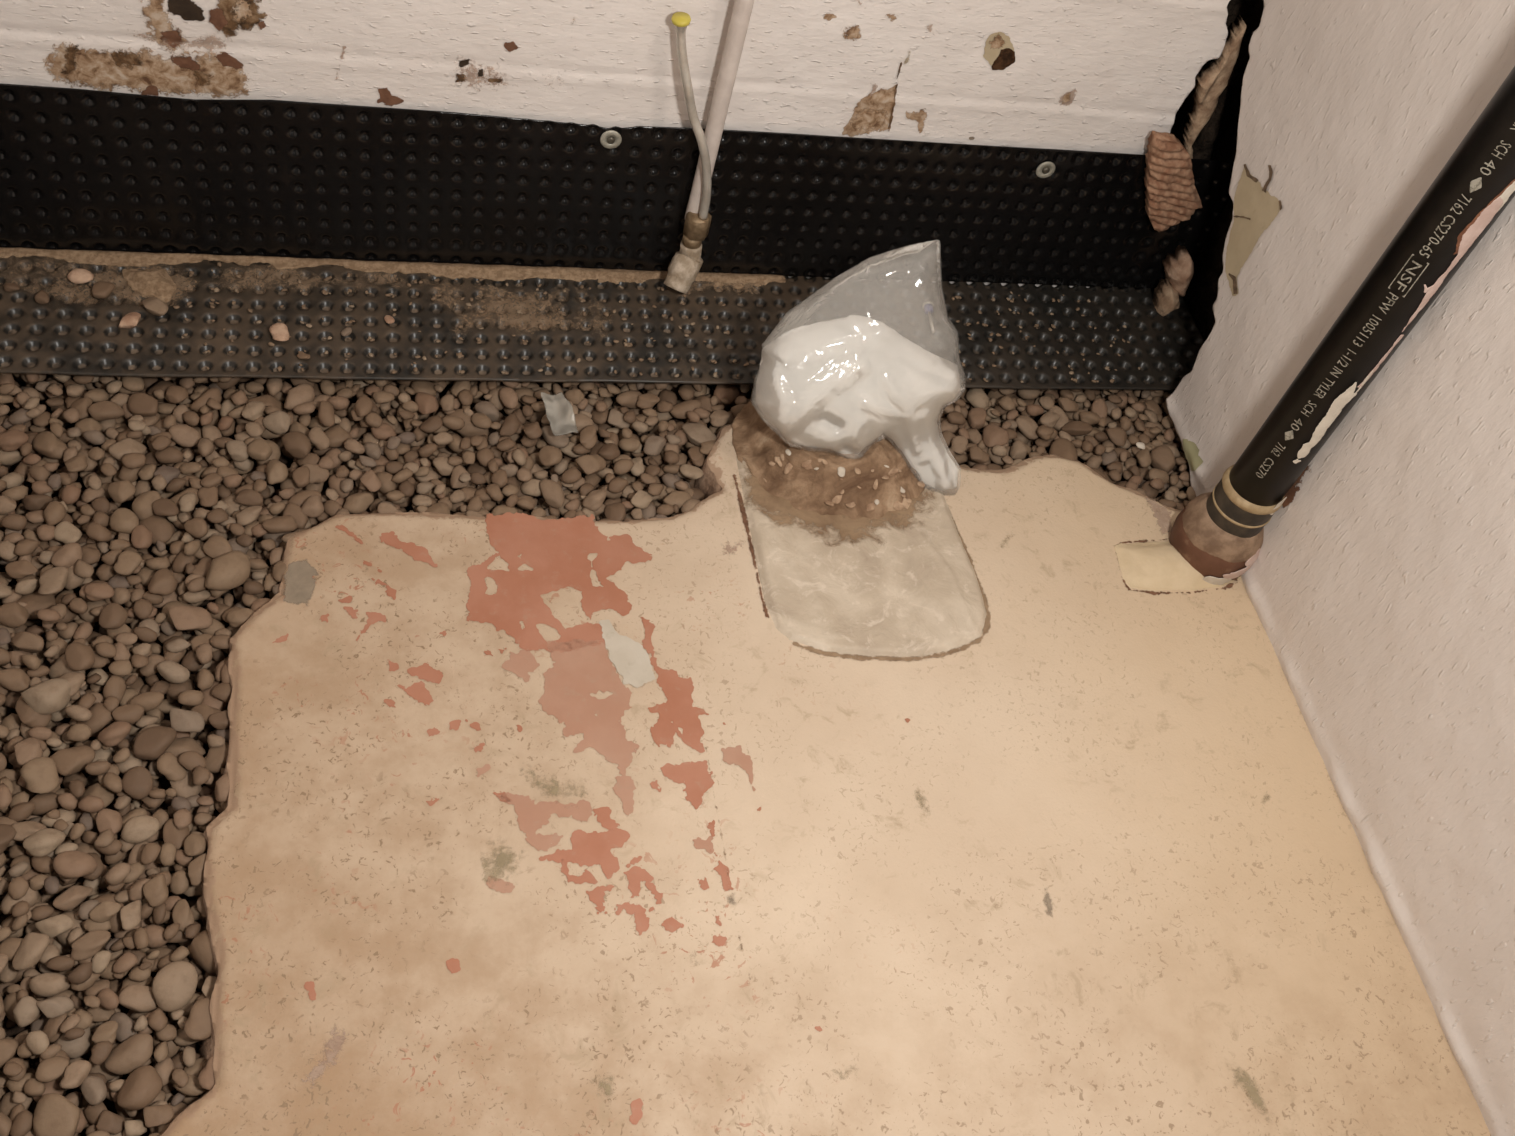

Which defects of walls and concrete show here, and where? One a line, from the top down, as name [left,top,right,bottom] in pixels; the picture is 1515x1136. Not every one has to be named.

spalling [983,32,1015,70]
peeling [842,62,927,137]
peeling [1225,164,1282,296]
peeling [319,525,438,641]
peeling [384,660,443,707]
peeling [427,719,491,777]
peeling [466,512,761,935]
peeling [712,916,727,946]